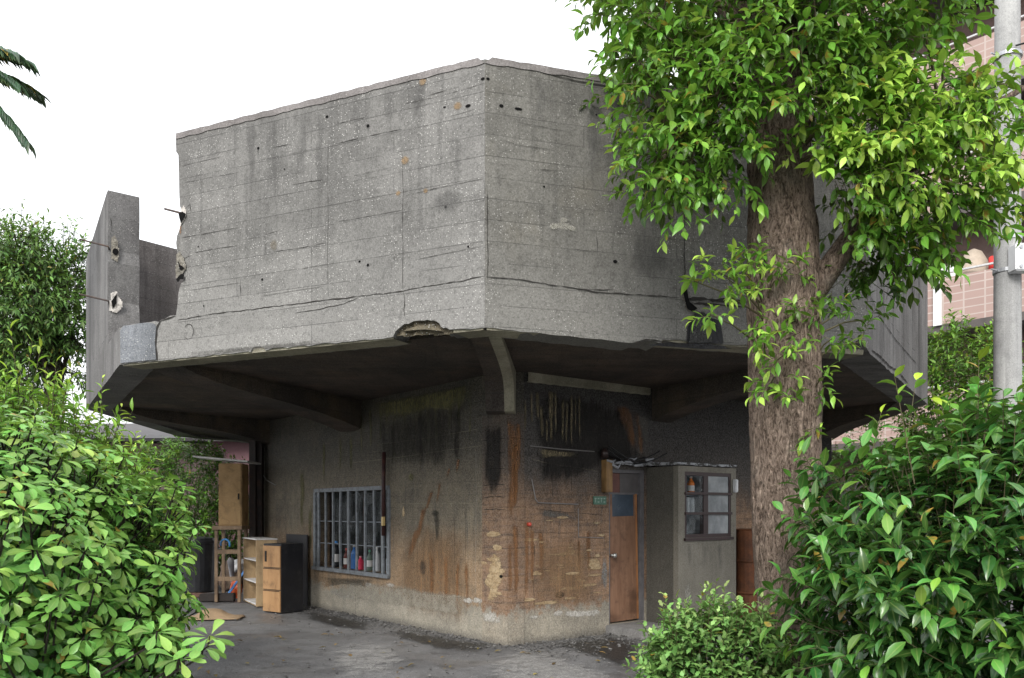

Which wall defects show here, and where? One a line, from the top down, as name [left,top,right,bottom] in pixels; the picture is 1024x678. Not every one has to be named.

spalling [164,206,191,233]
spalling [79,235,119,262]
crack [155,122,741,359]
spalling [175,251,188,282]
spalling [79,291,123,313]
spalling [396,321,454,337]
water stain [524,393,580,456]
peeling [481,531,505,600]
corrosion [509,527,590,598]